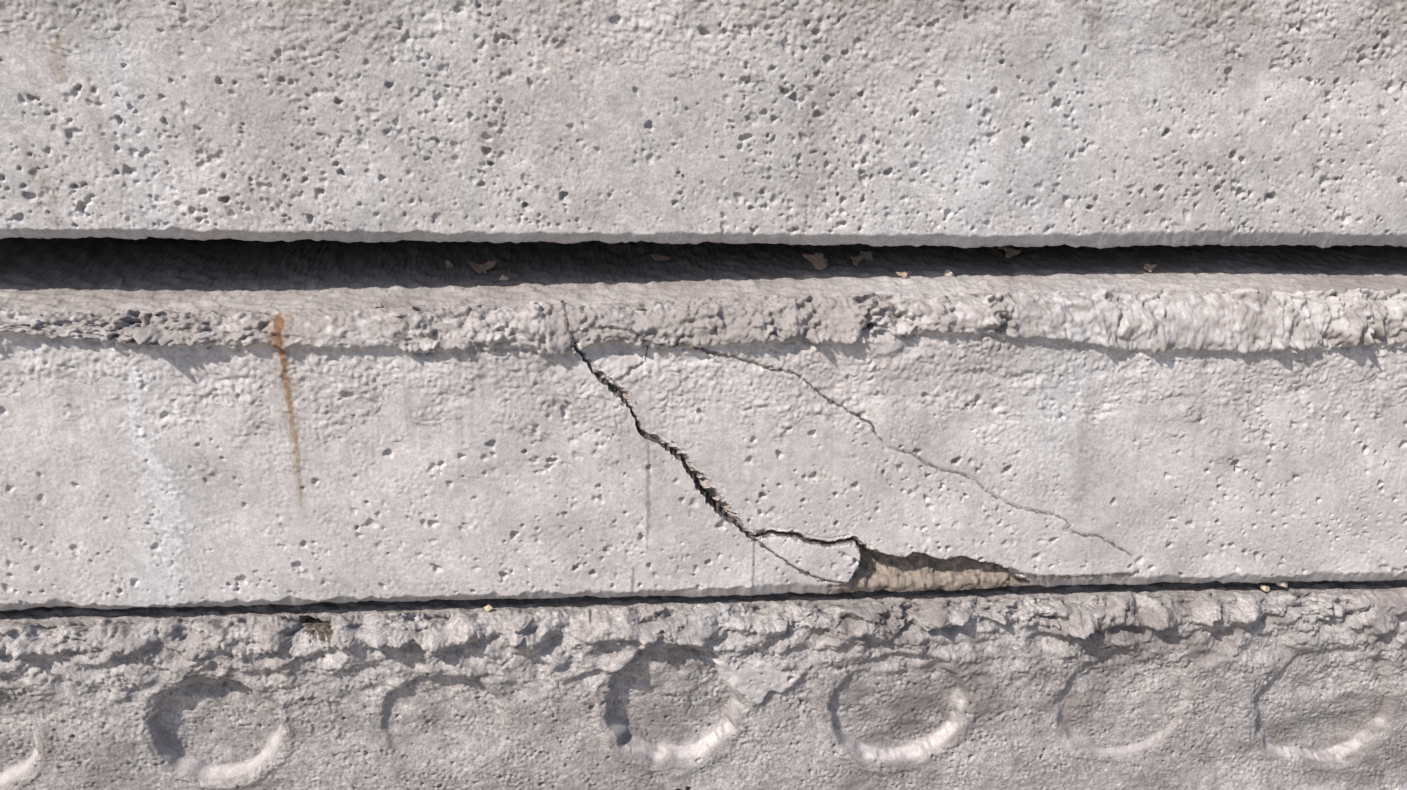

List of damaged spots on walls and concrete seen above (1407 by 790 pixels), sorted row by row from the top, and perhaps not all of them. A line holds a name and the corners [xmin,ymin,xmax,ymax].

corrosion [273,319,298,451]
crack [561,300,1139,584]
spalling [0,536,1407,664]